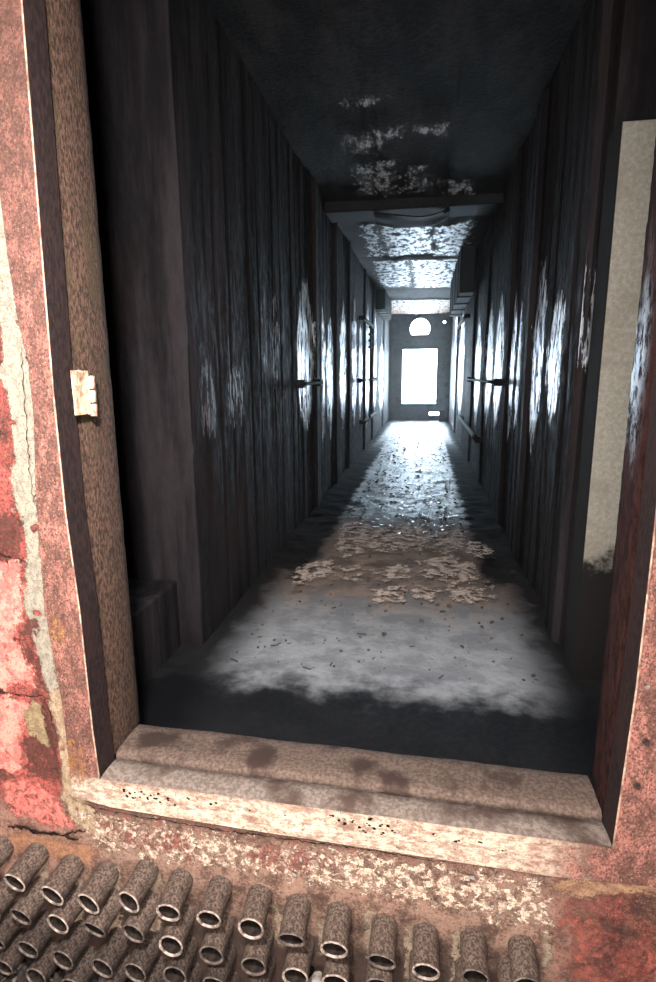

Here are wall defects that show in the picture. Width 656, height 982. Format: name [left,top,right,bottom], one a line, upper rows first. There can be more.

crack [8,796,456,864]
peeling [0,200,656,982]